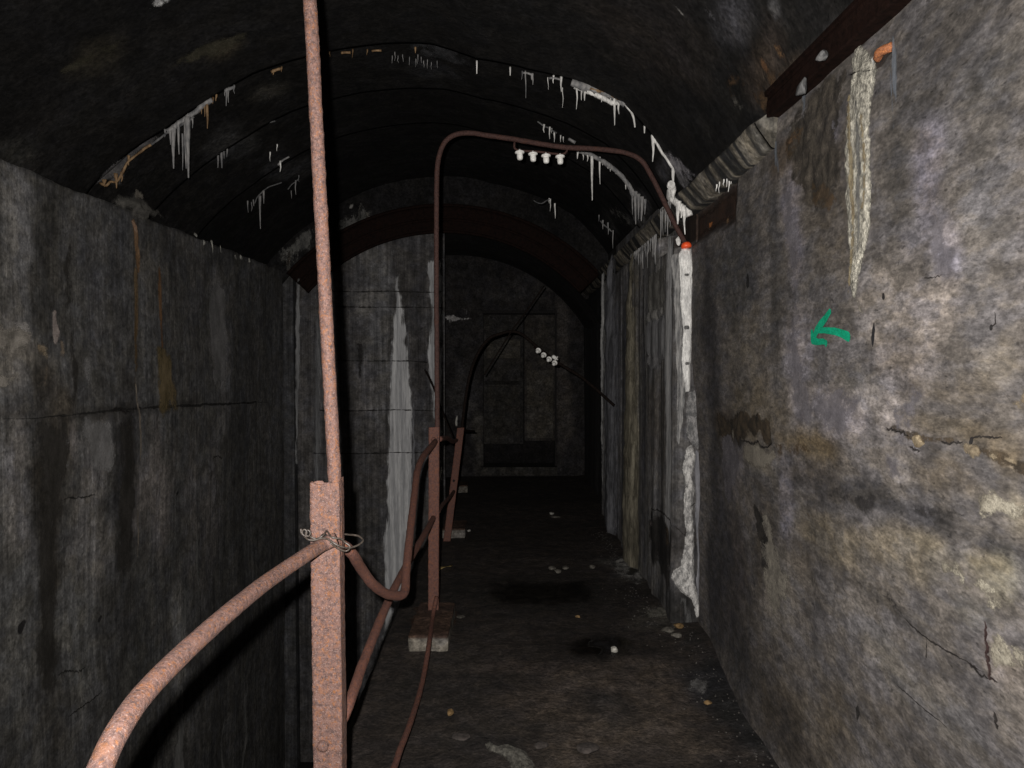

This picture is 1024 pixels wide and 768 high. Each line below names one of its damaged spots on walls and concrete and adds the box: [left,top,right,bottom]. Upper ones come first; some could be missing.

water stain [571,79,636,128]
water stain [577,151,647,224]
water stain [651,135,691,188]
water stain [832,45,877,313]
water stain [382,281,416,640]
water stain [600,254,686,588]
spalling [686,390,699,449]
peeling [717,410,775,503]
crack [902,615,997,682]